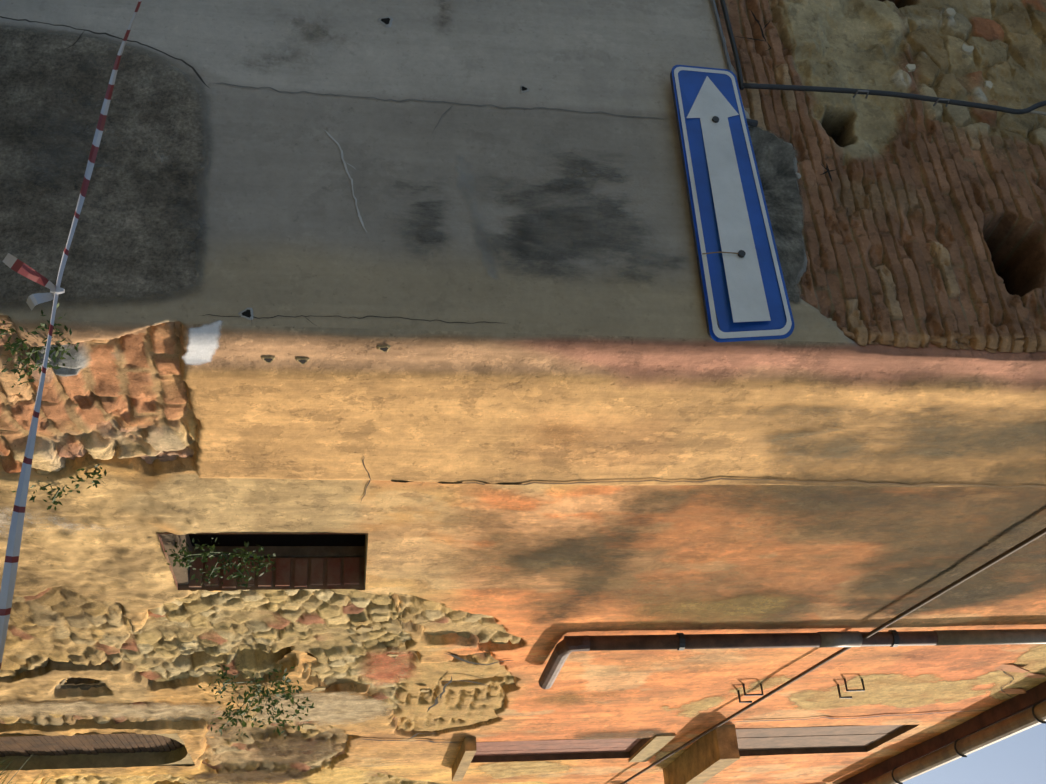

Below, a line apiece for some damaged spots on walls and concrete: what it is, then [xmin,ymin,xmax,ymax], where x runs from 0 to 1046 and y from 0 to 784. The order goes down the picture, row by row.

crack [0,16,666,131]
leakage [0,26,208,308]
crack [326,131,367,232]
leakage [492,200,640,275]
flaking render [715,0,1046,353]
flaking render [0,316,198,475]
crack [361,454,1045,500]
leakage [470,408,1046,627]
flaking render [0,701,442,784]
flaking render [0,586,521,731]
crack [365,653,514,743]
peeling [478,761,569,784]